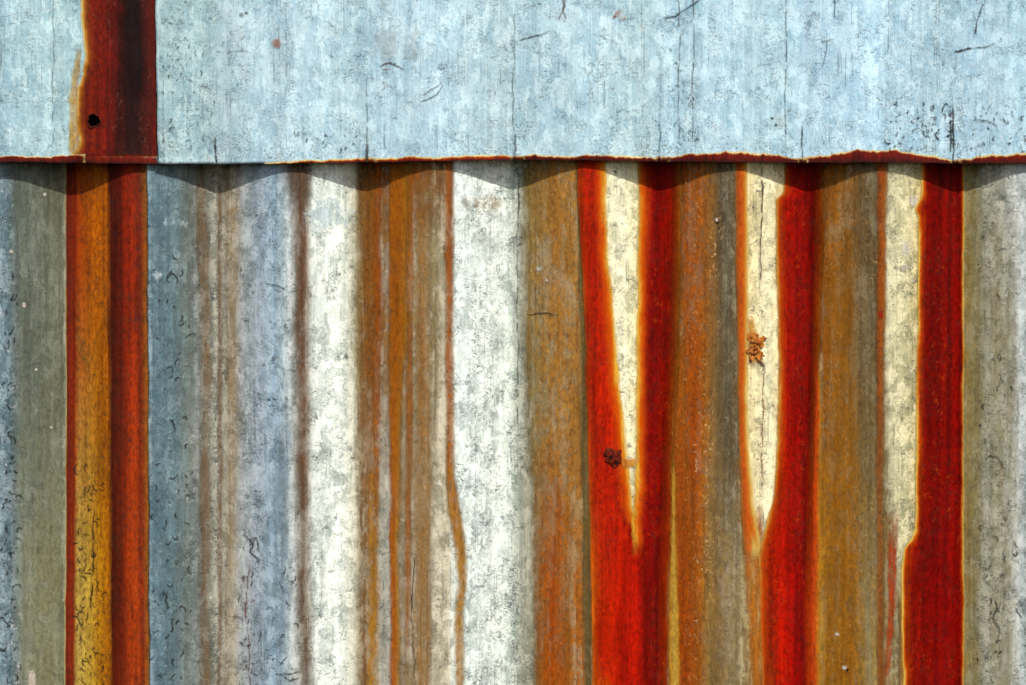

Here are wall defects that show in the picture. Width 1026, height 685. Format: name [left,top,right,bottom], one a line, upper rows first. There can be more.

corrosion [0,0,158,685]
corrosion [265,149,1026,685]